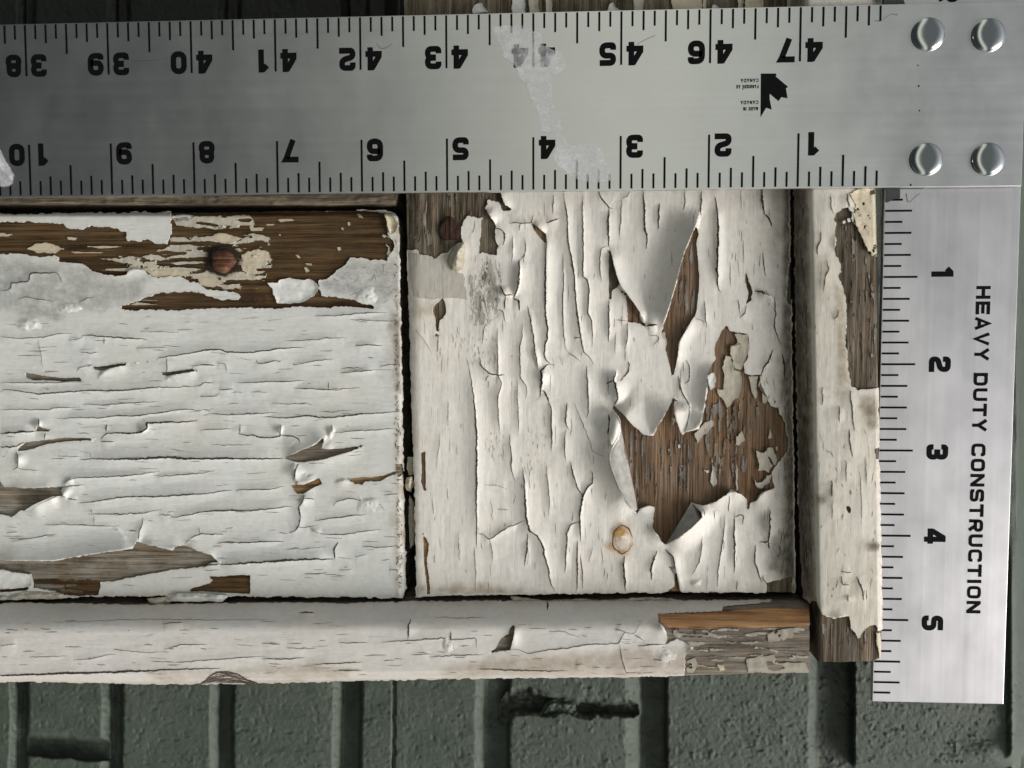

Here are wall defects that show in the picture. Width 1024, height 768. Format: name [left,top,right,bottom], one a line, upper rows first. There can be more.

rust [205,245,243,277]
peeling [0,193,511,331]
peeling [609,251,645,326]
peeling [661,227,699,375]
peeling [834,189,878,390]
peeling [0,482,62,517]
peeling [0,542,251,604]
peeling [285,438,362,462]
peeling [349,452,430,594]
peeling [492,625,515,652]
peeling [510,573,881,675]
peeling [613,326,788,544]